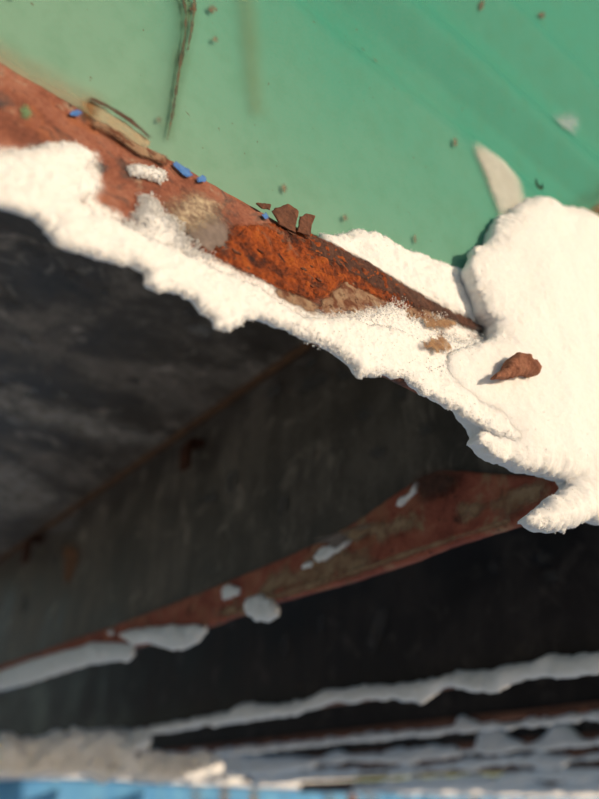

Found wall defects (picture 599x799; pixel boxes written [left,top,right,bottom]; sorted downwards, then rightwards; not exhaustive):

corrosion [0,55,86,109]
corrosion [190,202,483,329]
corrosion [415,470,457,499]